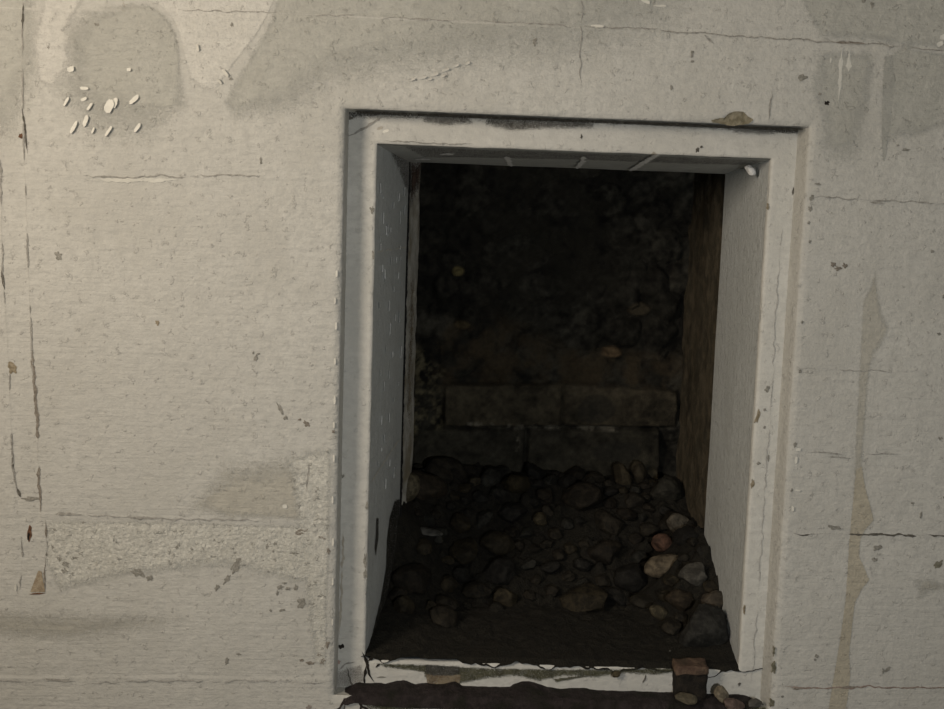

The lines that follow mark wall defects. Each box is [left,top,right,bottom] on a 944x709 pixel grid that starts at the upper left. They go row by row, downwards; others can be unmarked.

crack [813,196,944,205]
crack [0,2,292,537]
damp [829,276,889,709]
crack [847,531,944,539]
crack [19,537,46,589]